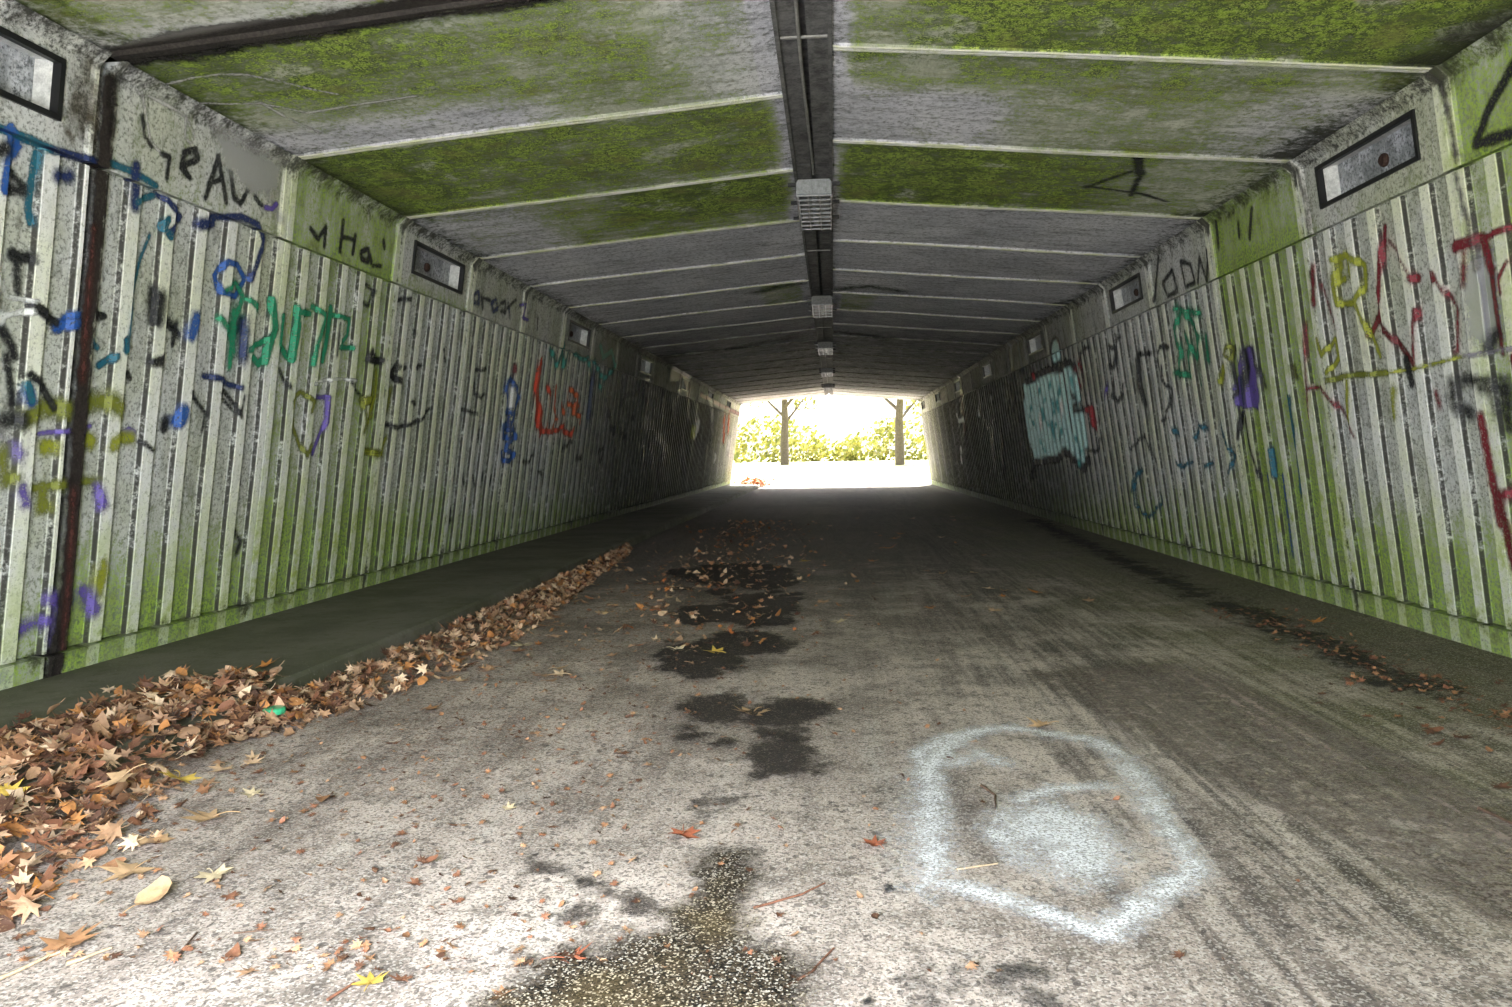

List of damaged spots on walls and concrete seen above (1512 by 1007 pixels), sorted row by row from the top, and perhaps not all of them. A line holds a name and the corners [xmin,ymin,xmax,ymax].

damp [66,0,562,147]
damp [1424,72,1480,272]
corrosion [41,72,118,678]
damp [467,847,816,1007]